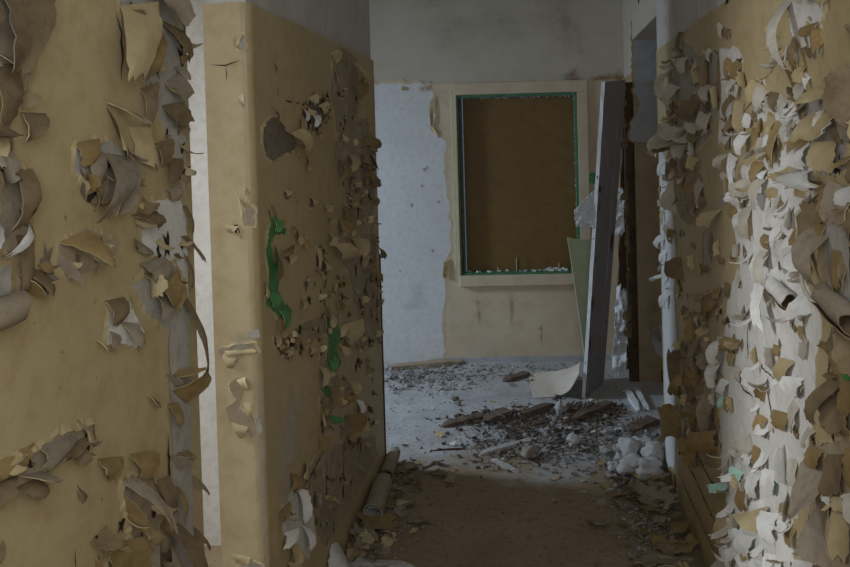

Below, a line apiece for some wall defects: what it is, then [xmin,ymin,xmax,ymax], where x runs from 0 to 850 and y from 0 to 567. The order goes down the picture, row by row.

peeling [0,0,265,567]
peeling [260,45,454,567]
peeling [620,0,850,567]